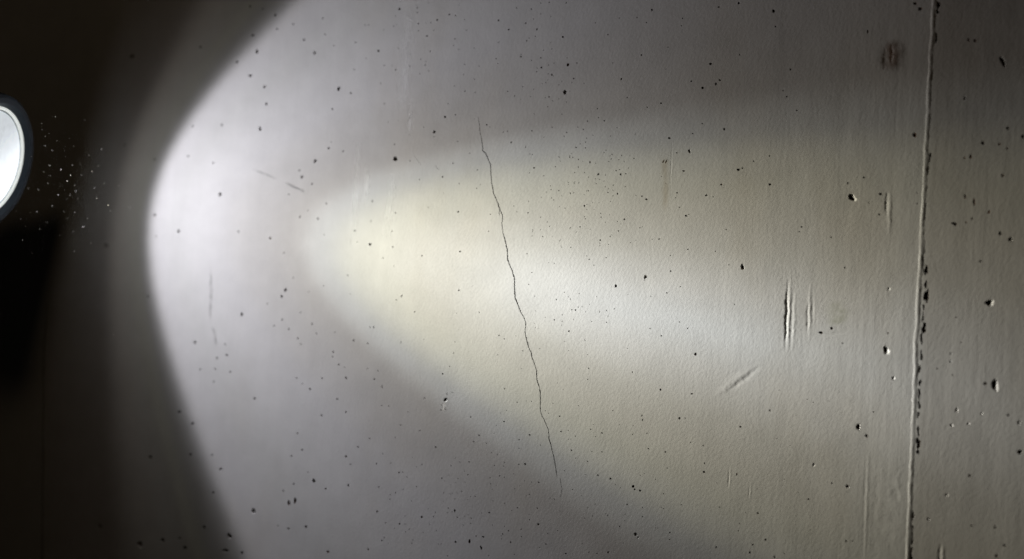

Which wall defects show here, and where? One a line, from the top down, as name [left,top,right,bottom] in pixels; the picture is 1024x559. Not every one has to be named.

crack [478,120,562,496]